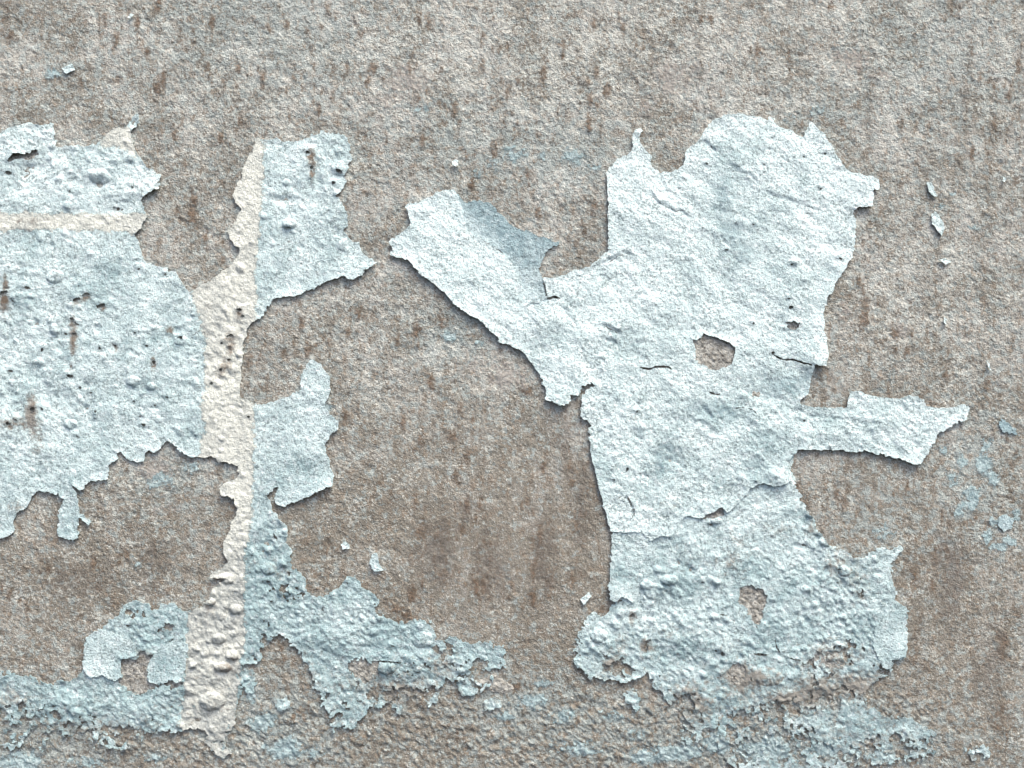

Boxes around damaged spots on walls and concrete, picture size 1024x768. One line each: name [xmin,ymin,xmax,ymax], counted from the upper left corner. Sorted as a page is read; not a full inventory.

peeling [0,113,577,768]
peeling [389,105,1020,768]